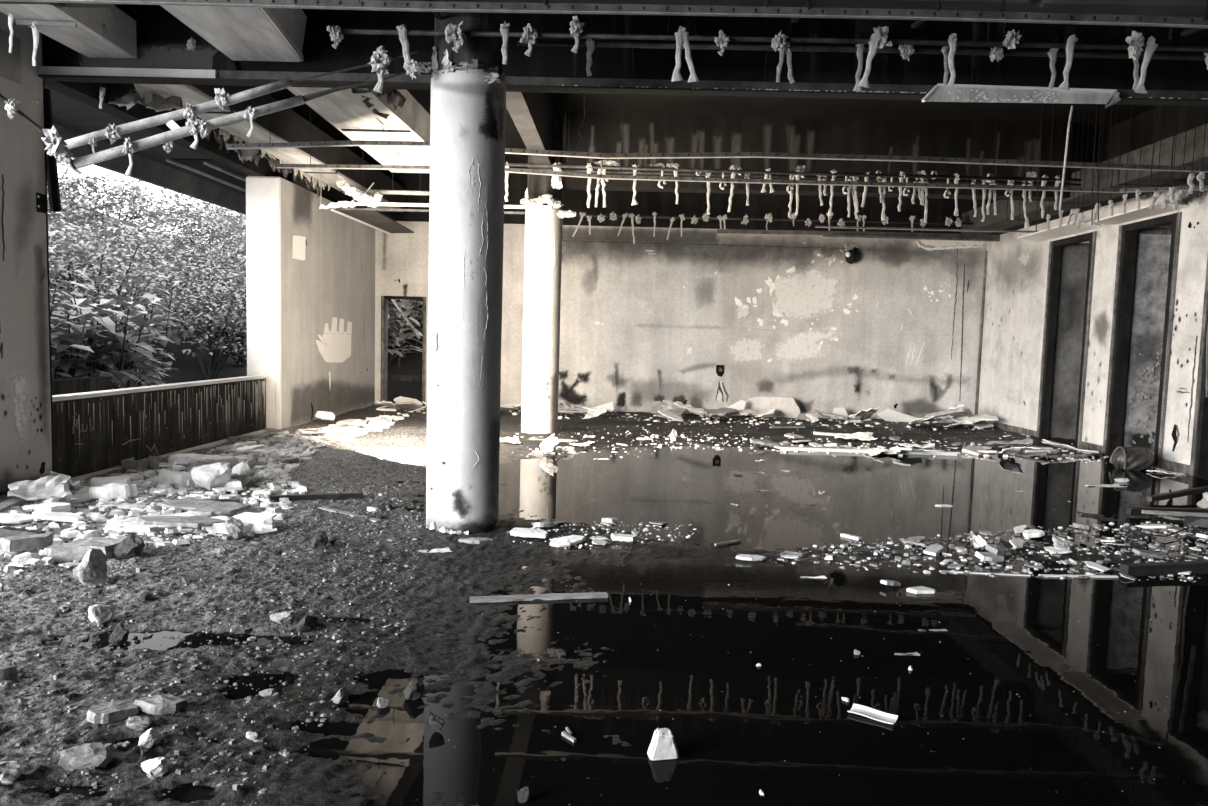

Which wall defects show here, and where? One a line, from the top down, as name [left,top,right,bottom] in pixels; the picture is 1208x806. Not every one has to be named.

peeling [716,242,858,402]
leakage [654,395,685,404]
leakage [904,401,940,414]